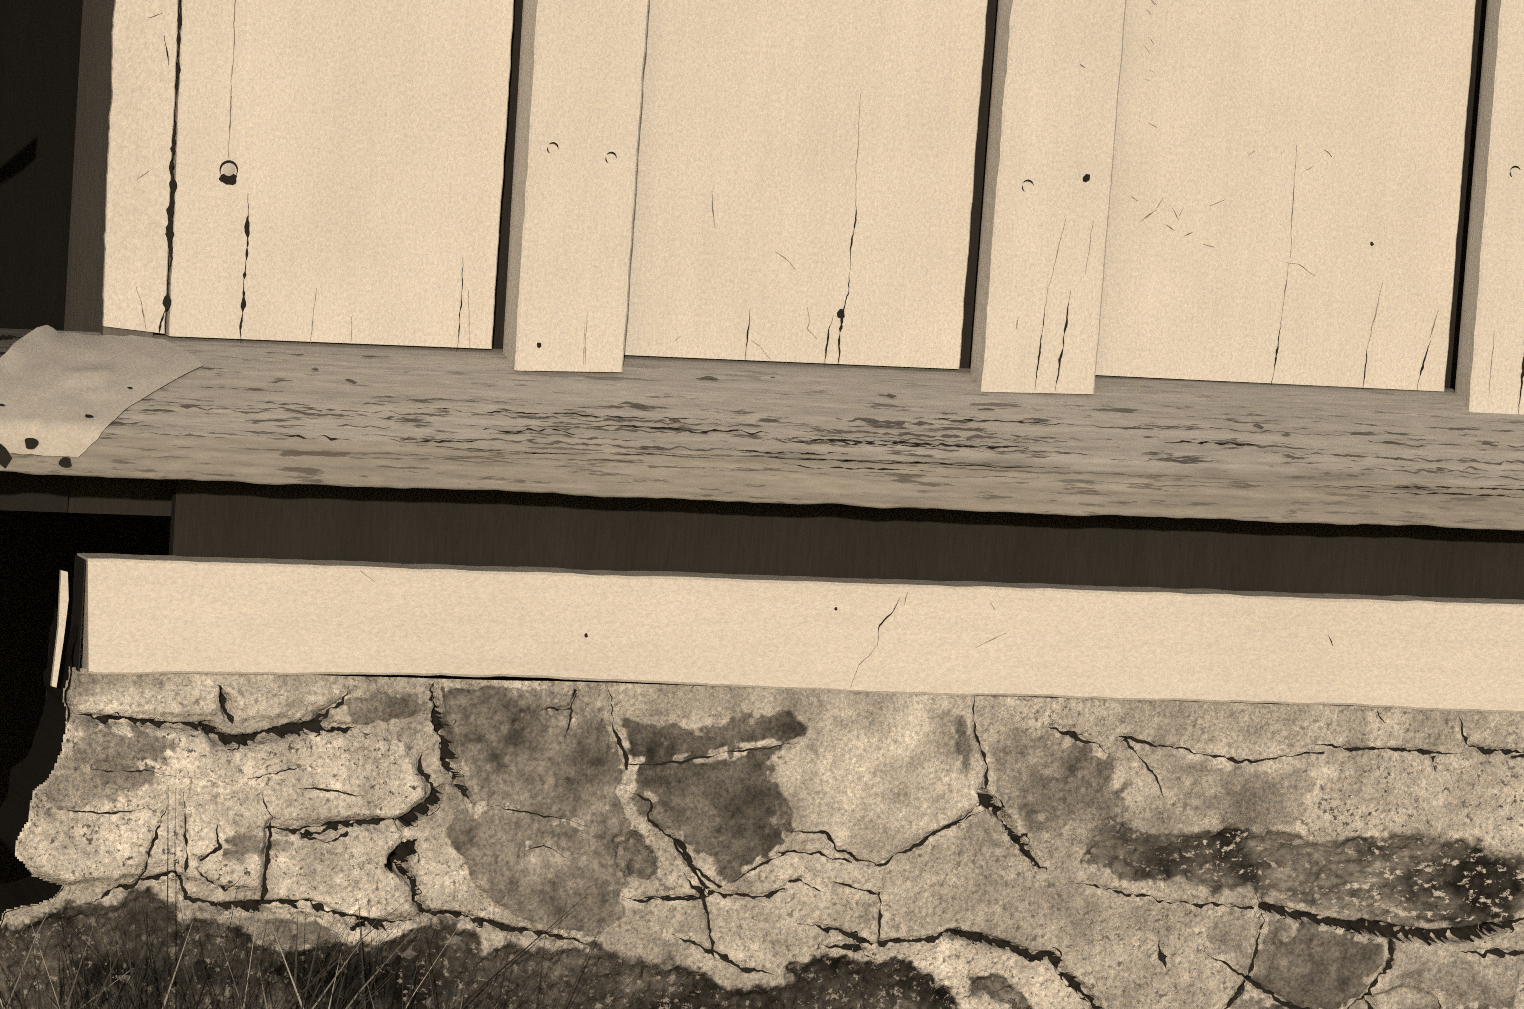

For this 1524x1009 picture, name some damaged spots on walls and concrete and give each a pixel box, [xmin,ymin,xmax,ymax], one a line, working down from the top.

crack [807,93,861,365]
crack [1271,145,1332,385]
crack [206,205,1524,498]
peeling [99,401,507,459]
peeling [526,439,643,463]
peeling [595,401,681,429]
peeling [745,408,1026,452]
peeling [1217,424,1315,457]
peeling [1368,431,1488,471]
crack [851,592,908,686]
crack [57,683,591,946]
crack [538,689,1524,1009]